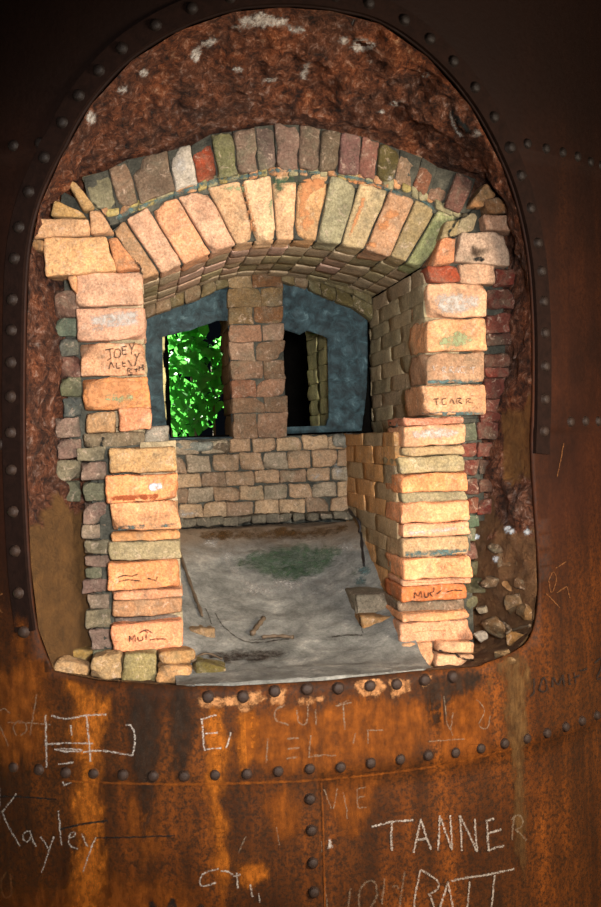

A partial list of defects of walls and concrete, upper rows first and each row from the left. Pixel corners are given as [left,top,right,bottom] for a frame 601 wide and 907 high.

corrosion [0,663,47,763]
corrosion [0,682,187,907]
leakage [127,690,160,835]
corrosion [165,679,504,884]
corrosion [240,864,267,888]